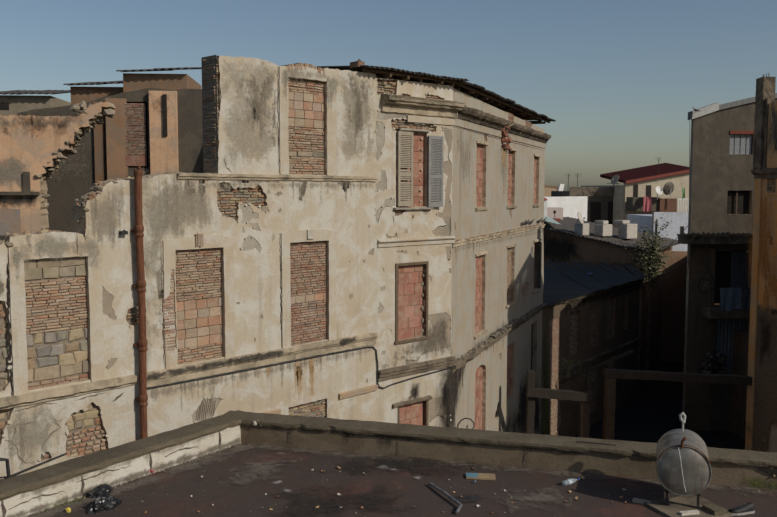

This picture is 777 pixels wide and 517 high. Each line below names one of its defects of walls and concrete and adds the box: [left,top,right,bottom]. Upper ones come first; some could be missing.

spalling [31,100,115,206]
flaking render [217,180,283,253]
peeling [368,170,407,228]
peeling [375,110,456,236]
peeling [102,286,116,320]
flaking render [126,304,139,328]
flaking render [163,271,176,356]
water stain [752,306,777,452]
flaking render [65,403,109,457]